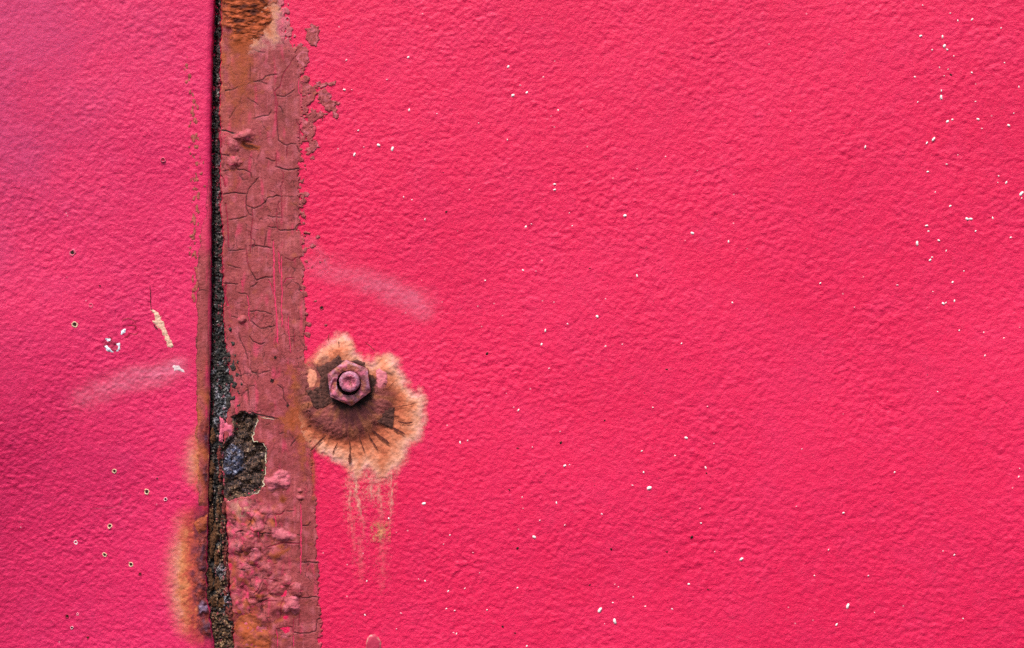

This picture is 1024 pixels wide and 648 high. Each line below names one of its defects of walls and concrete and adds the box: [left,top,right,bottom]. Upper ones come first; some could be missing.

corrosion [221,0,280,125]
peeling [173,0,341,648]
corrosion [190,420,209,484]
corrosion [279,333,427,509]
corrosion [174,508,212,638]